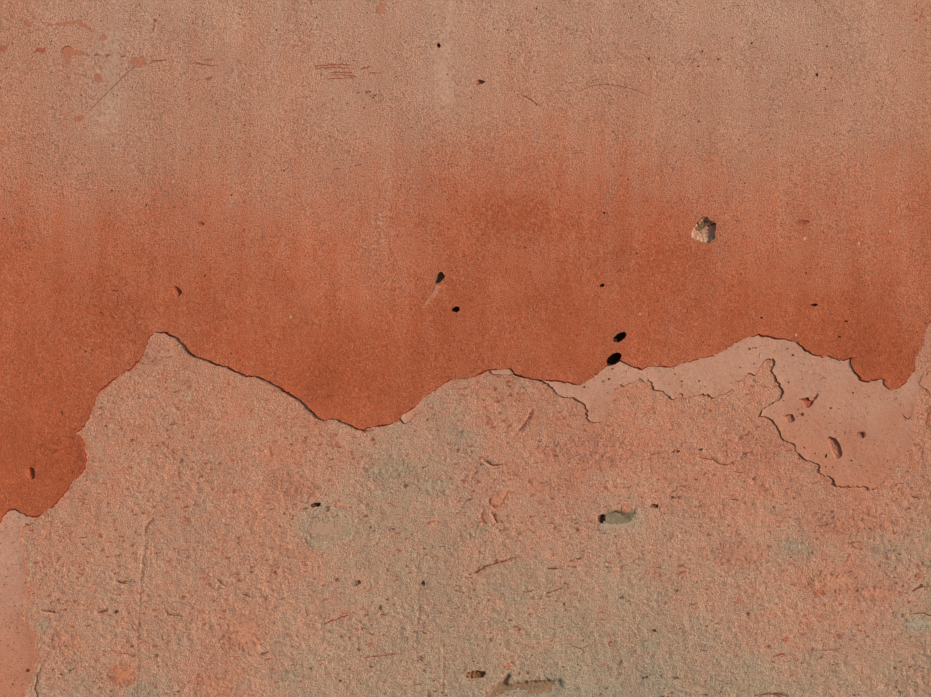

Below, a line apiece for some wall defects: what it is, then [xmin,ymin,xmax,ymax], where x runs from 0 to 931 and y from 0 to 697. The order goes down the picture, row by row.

spalling [691,216,717,243]
flaking render [0,321,931,697]